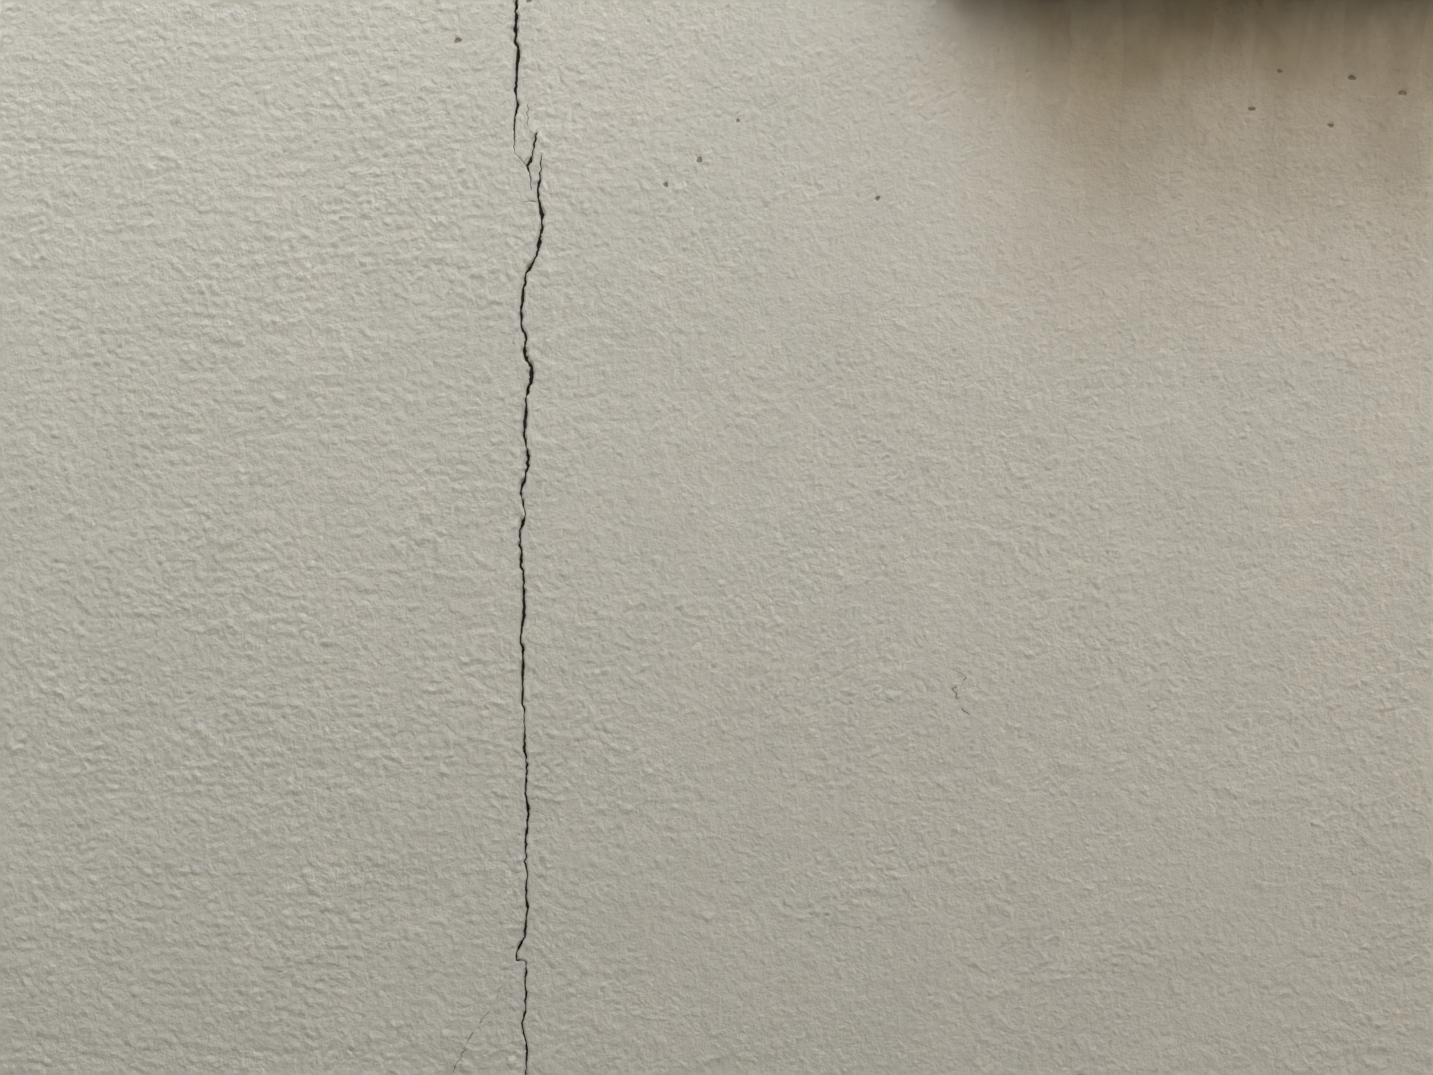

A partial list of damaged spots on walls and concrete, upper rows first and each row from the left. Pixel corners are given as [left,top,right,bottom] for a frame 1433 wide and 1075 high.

crack [453,0,545,1075]